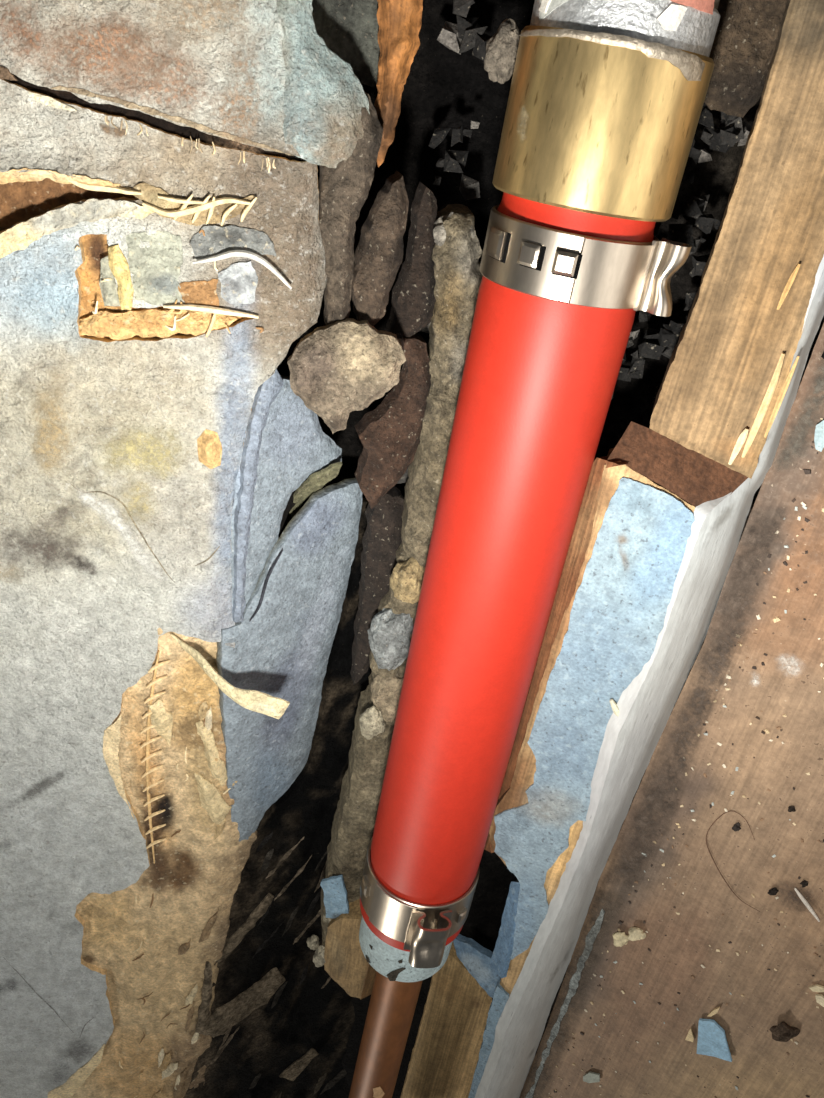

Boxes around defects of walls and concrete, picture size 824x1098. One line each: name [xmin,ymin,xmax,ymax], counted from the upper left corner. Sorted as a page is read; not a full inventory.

crack [0,66,306,173]
peeling [47,628,290,1098]